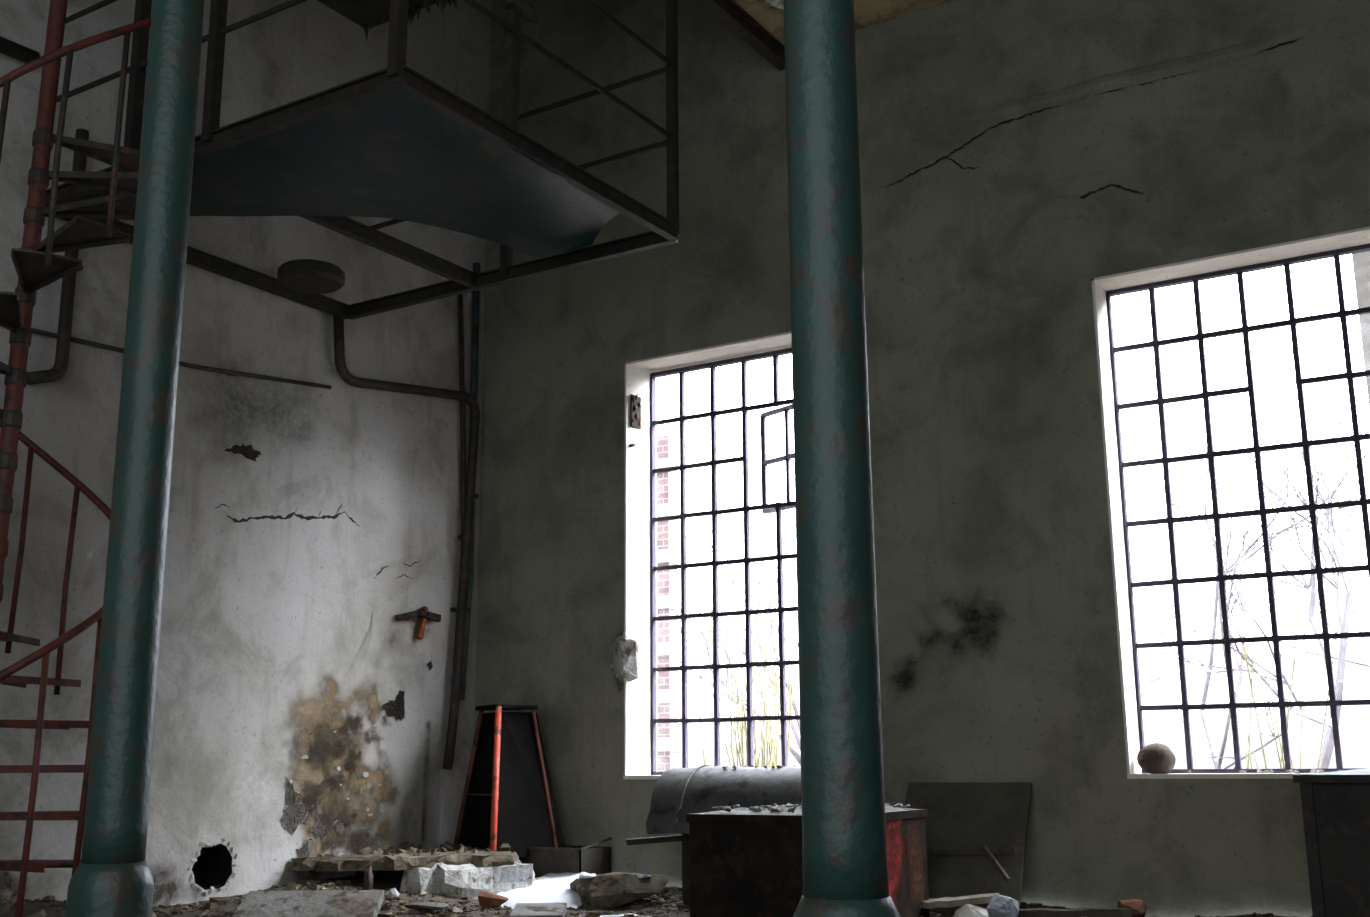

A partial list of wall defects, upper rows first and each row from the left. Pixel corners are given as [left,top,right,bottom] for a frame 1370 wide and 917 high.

spalling [222,442,262,463]
crack [215,504,360,526]
spalling [380,689,405,723]
spalling [188,838,238,897]